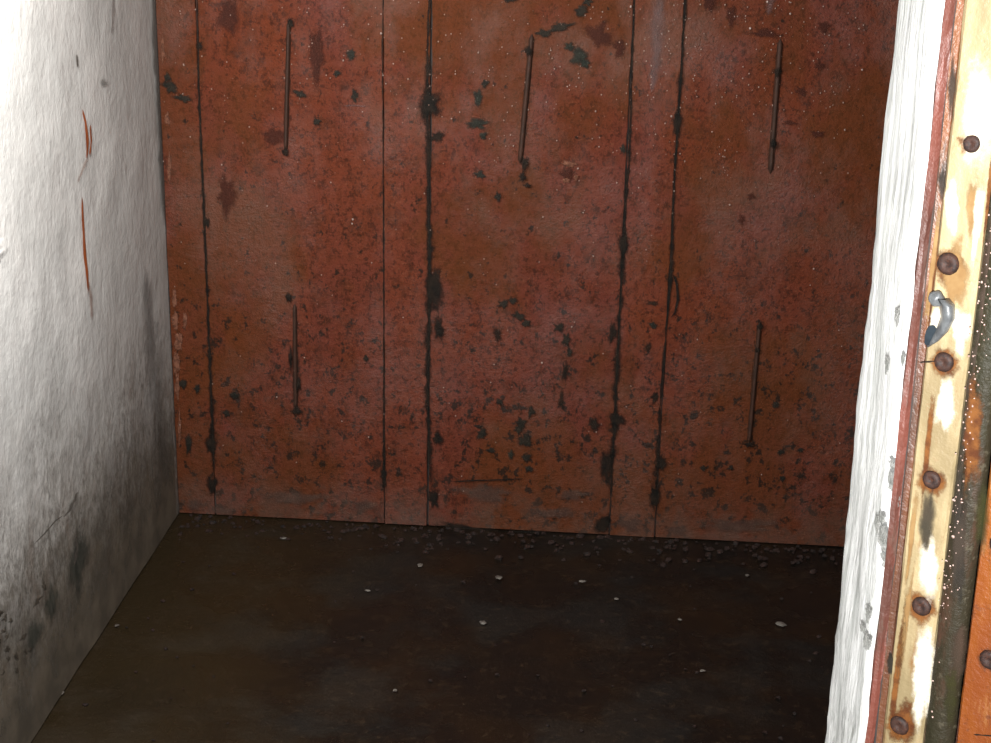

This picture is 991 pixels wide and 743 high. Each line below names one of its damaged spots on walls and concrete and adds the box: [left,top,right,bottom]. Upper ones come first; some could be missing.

water stain [0,435,176,743]
rust [196,2,217,494]
rust [419,0,444,475]
rust [590,0,635,487]
rust [649,0,687,508]
rust [876,0,967,743]